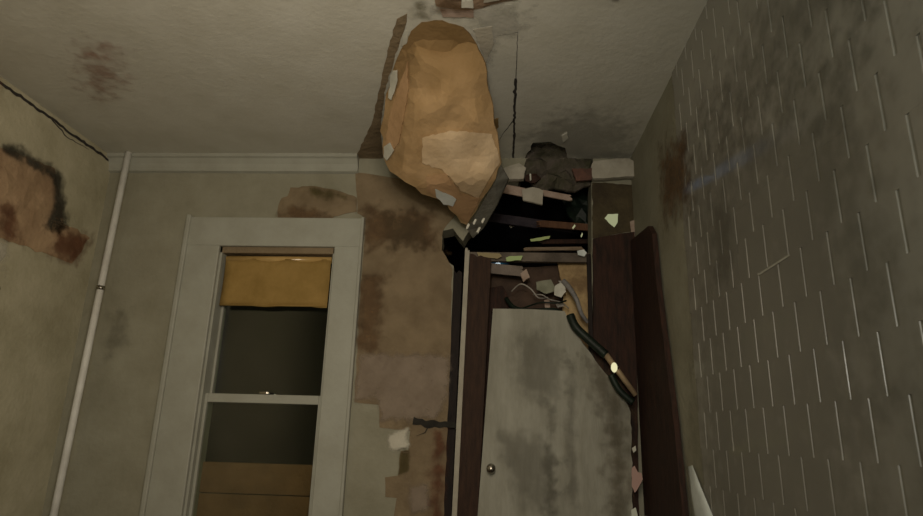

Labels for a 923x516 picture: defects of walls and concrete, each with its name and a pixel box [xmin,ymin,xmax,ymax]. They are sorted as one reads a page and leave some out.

spalling [435,0,512,11]
crack [0,81,109,161]
crack [497,32,518,158]
spalling [277,173,455,516]